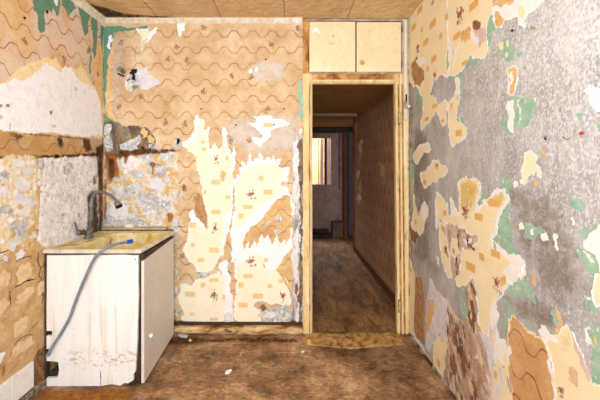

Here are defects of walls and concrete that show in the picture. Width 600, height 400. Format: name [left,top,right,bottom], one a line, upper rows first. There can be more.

peeling [411,56,424,106]
peeling [446,92,468,147]
peeling [502,66,537,134]
crack [0,246,44,305]
peeling [0,0,186,400]
peeling [224,78,303,322]
peeling [493,178,519,255]
peeling [503,264,536,335]
peeling [519,222,565,252]
peeling [571,217,600,240]
peeling [576,246,599,279]
peeling [580,320,600,385]